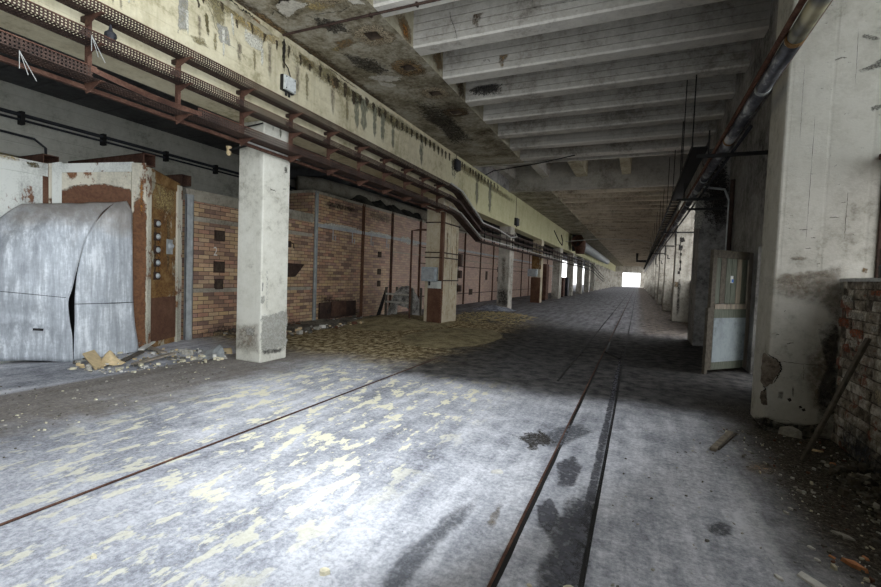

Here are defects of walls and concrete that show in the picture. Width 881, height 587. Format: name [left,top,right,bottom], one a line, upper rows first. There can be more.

peeling [178,0,189,31]
water stain [191,0,473,161]
water stain [457,83,503,97]
water stain [461,162,512,211]
corrosion [49,181,174,348]
water stain [778,272,837,307]
spalling [760,353,782,405]